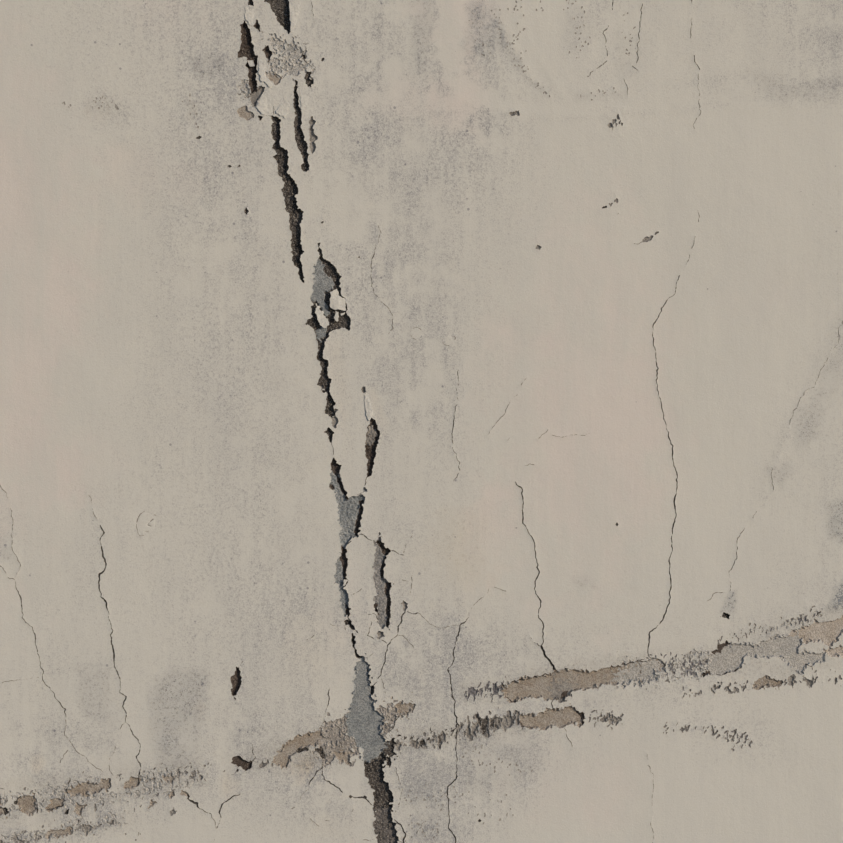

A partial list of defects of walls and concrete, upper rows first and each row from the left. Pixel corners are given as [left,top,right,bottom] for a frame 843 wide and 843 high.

peeling [235,0,324,121]
crack [647,213,700,656]
crack [0,486,141,775]
peeling [0,762,211,843]
peeling [230,661,243,700]
peeling [223,709,359,775]
spalling [324,387,413,643]
crack [515,464,556,670]
peeling [374,606,843,757]